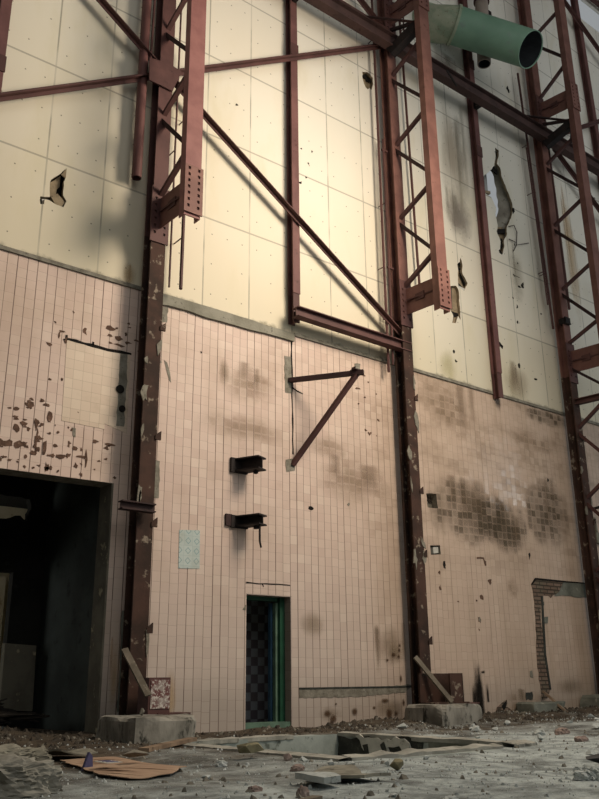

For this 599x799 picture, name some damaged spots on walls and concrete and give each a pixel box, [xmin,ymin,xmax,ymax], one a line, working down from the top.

peeling [106,323,139,427]
spalling [0,398,115,477]
flaking render [525,578,587,700]
water stain [473,670,489,714]